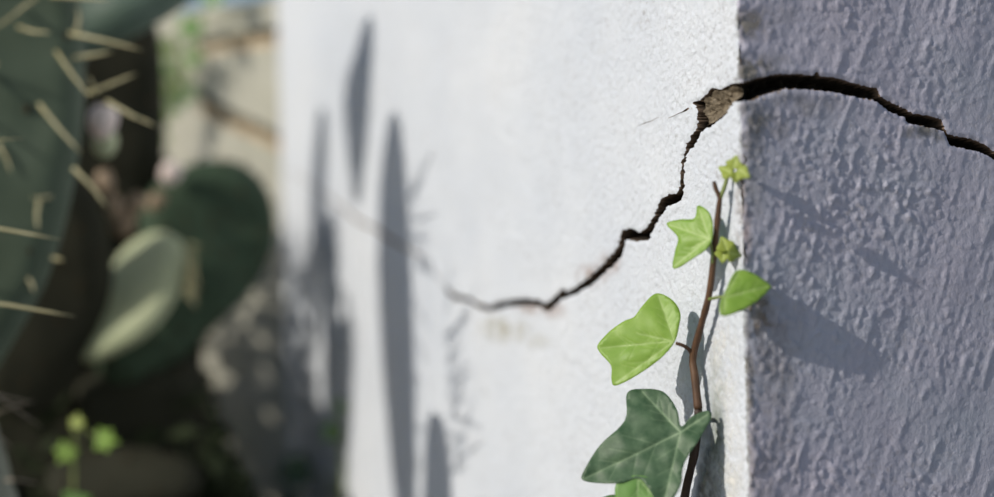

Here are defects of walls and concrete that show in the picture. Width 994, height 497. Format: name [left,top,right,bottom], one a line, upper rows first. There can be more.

crack [428,15,994,313]